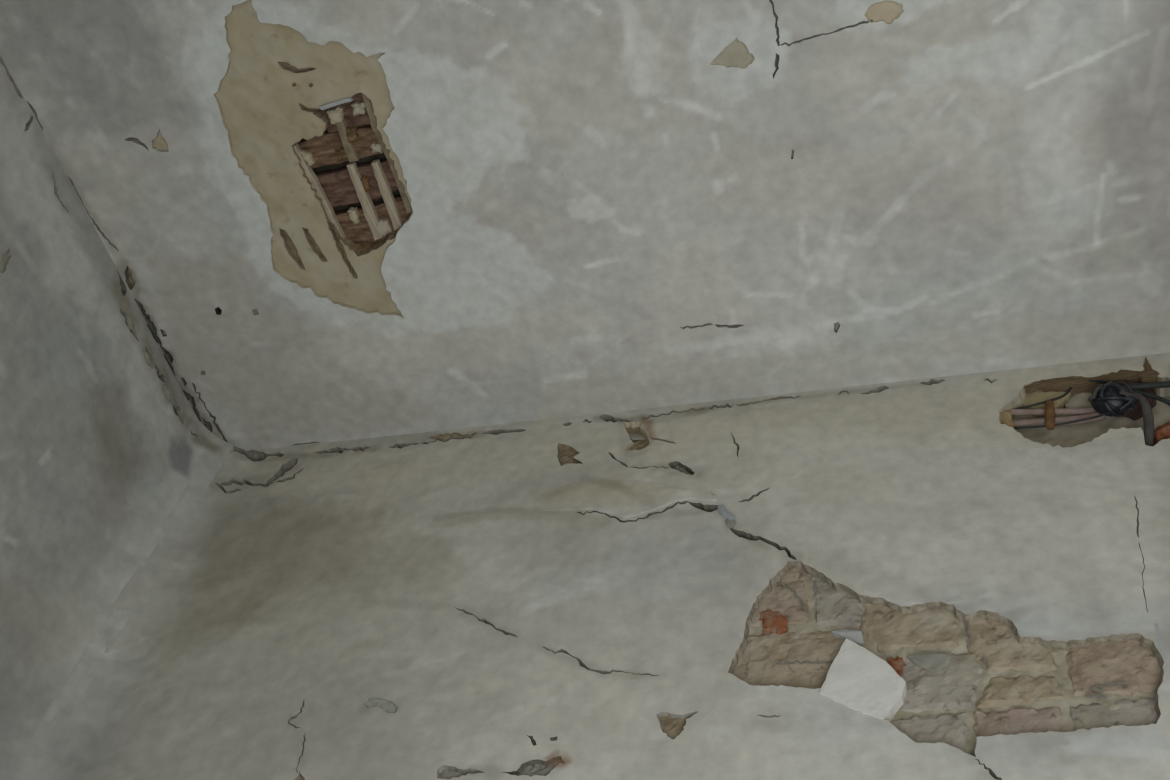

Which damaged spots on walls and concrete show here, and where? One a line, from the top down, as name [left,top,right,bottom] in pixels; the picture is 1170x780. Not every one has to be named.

flaking render [710,37,755,69]
crack [769,0,873,78]
flaking render [214,0,413,318]
flaking render [999,369,1170,448]
flaking render [557,443,583,466]
crack [576,488,797,560]
crack [455,607,660,676]
flaking render [728,561,1164,757]
flaking render [436,765,485,779]
flaking render [502,735,565,777]
flaking render [656,711,698,739]
crack [976,759,1002,780]